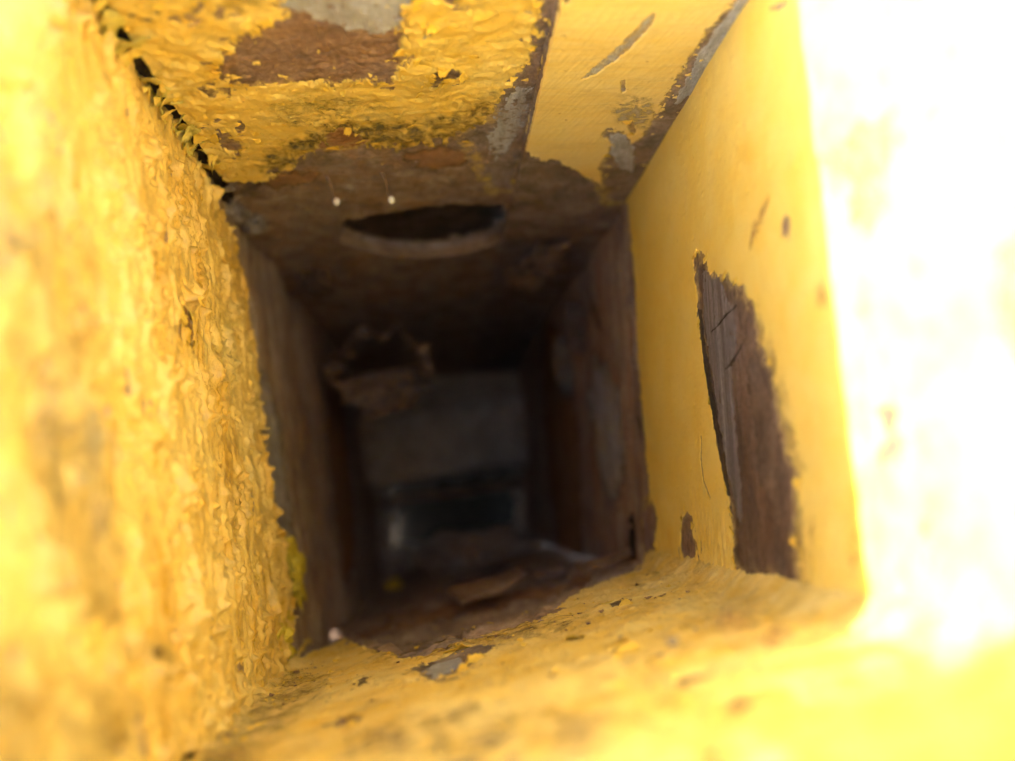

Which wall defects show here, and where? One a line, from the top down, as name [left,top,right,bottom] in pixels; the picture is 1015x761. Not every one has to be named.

crack [91,0,253,226]
peeling [137,0,241,27]
peeling [193,0,439,98]
peeling [416,67,470,98]
peeling [444,0,469,12]
peeling [692,248,801,582]
peeling [873,396,912,472]
peeling [678,511,702,560]